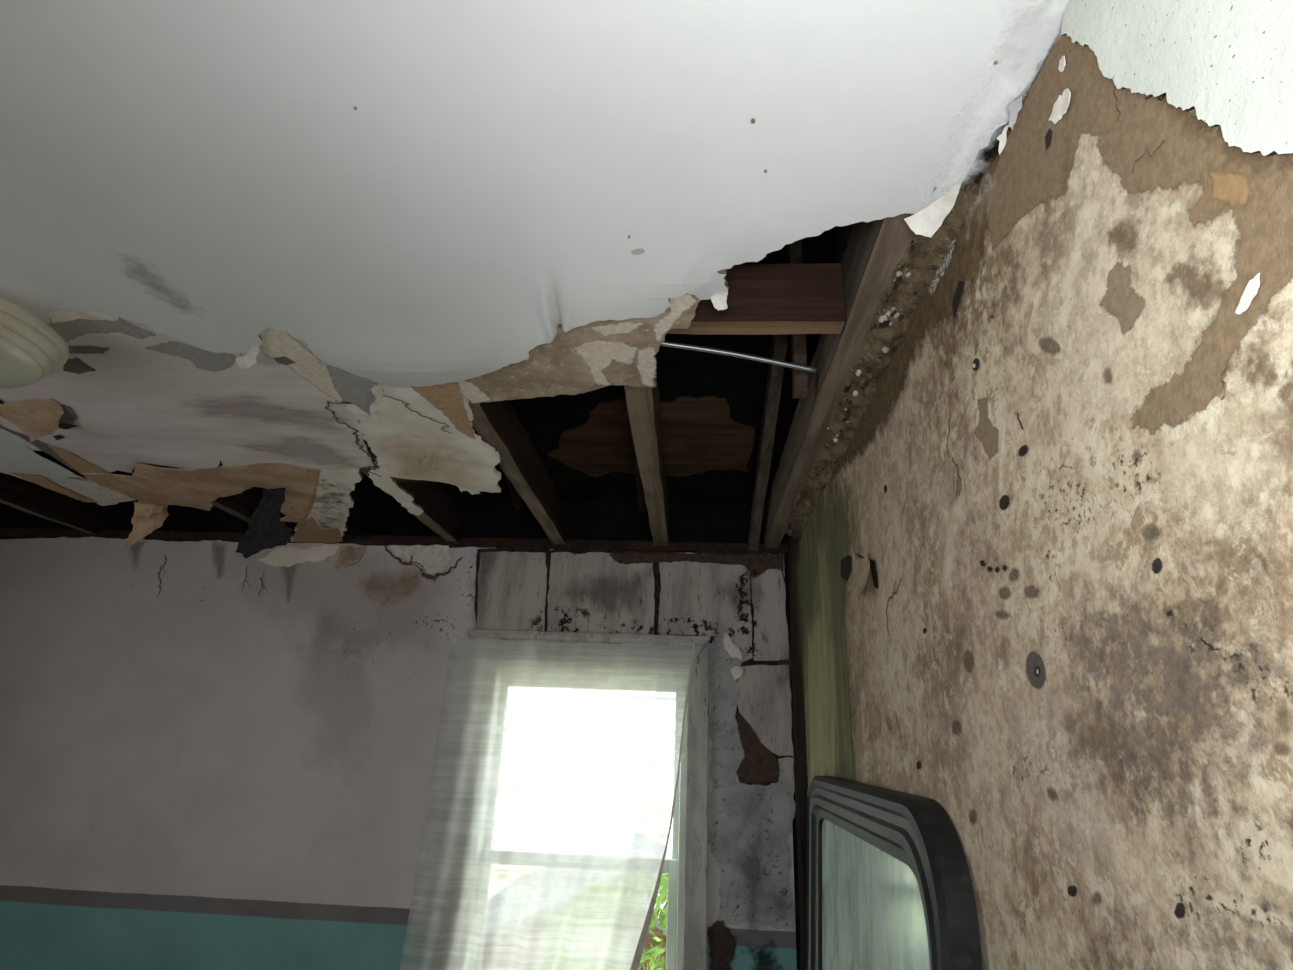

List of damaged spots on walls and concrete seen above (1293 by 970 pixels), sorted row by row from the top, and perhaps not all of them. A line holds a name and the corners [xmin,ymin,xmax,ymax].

flaking render [785,0,1293,538]
peeling [711,287,729,311]
peeling [840,553,878,599]
spalling [1152,558,1162,574]
water stain [1069,595,1293,825]
peeling [474,547,796,929]
spalling [1175,903,1185,918]
water stain [708,921,780,970]